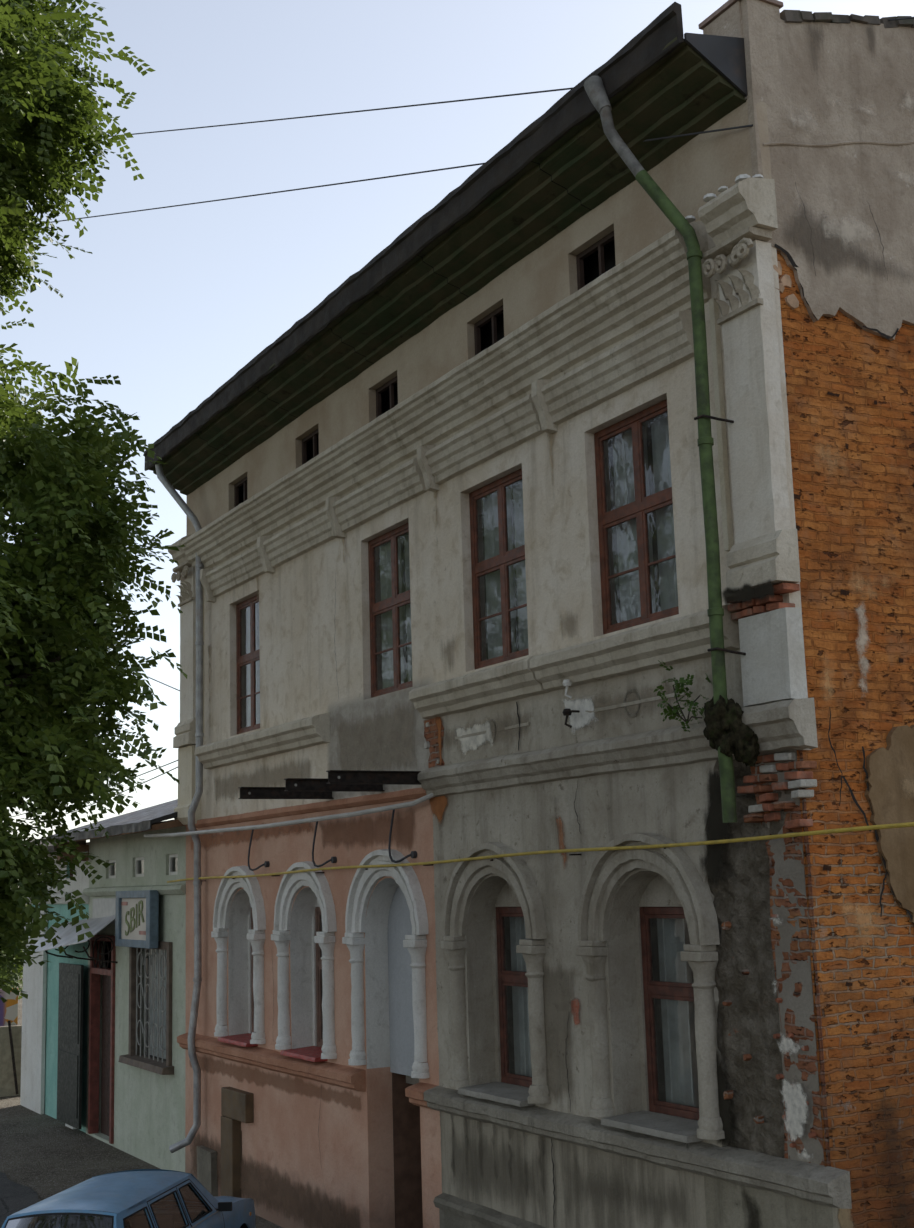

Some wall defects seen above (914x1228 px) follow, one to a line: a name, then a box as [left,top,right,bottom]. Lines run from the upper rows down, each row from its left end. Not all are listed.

spalling [424,717,492,768]
spalling [708,251,914,1228]
water stain [746,1197,759,1228]